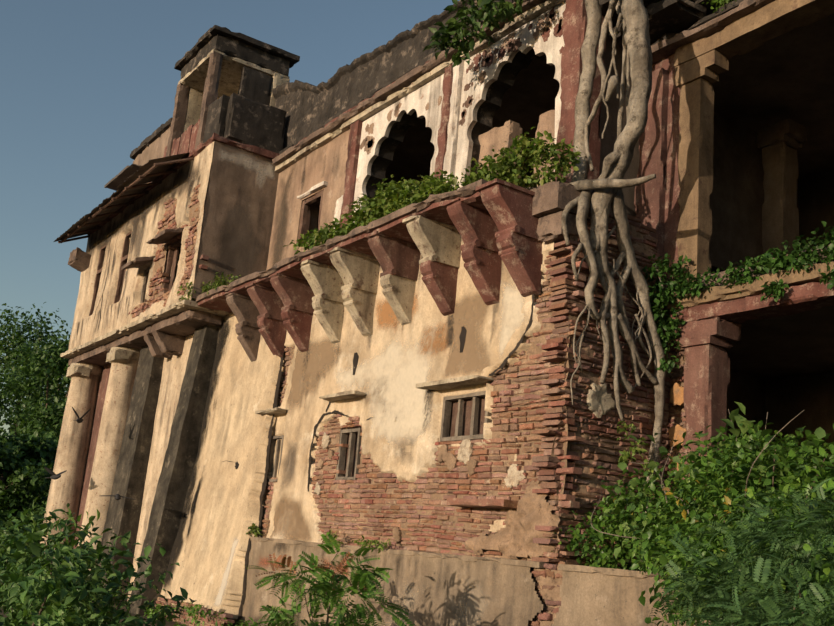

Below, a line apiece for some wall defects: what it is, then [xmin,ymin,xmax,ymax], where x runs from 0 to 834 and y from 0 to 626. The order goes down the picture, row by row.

peeling [528,7,564,54]
peeling [459,32,522,126]
spalling [128,180,209,318]
spalling [311,249,616,626]
leakage [181,482,200,534]
leakage [215,540,238,605]